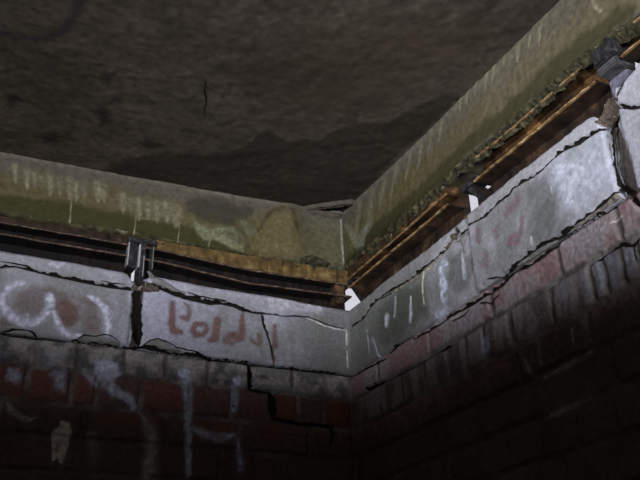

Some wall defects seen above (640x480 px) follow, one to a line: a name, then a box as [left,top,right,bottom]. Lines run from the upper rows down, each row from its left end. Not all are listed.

leakage [350,10,629,253]
leakage [24,170,85,223]
leakage [121,198,180,243]
leakage [190,201,262,251]
leakage [48,261,66,269]
crack [0,75,640,447]
leakage [596,254,616,291]